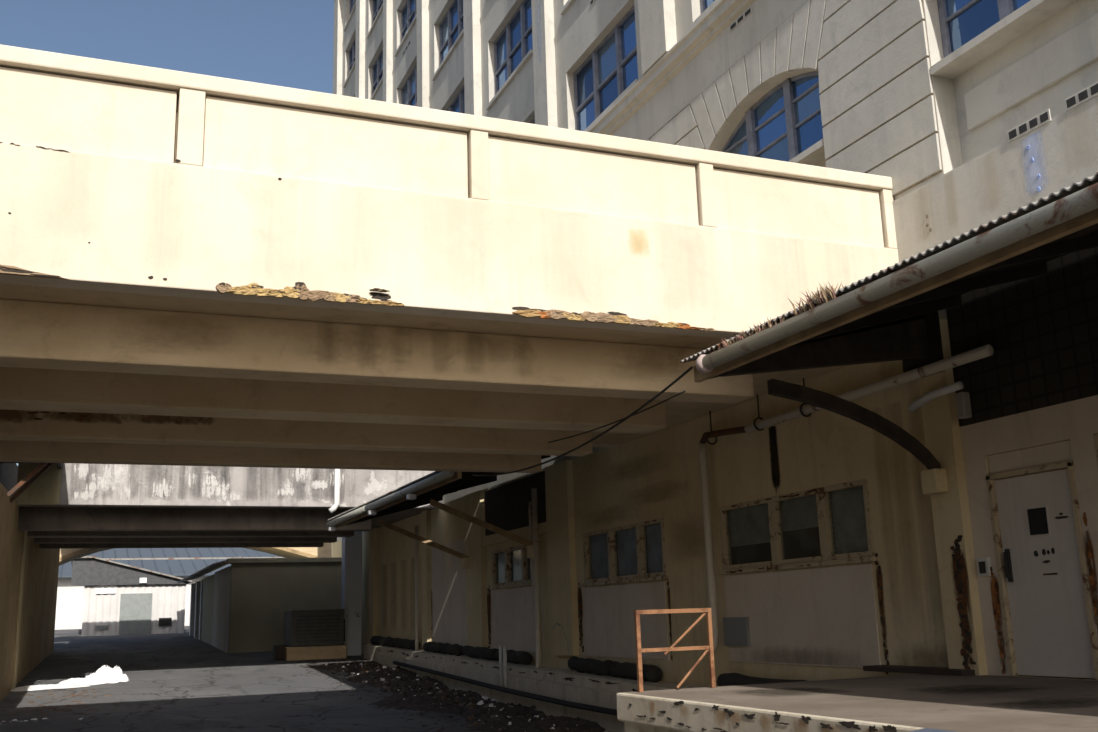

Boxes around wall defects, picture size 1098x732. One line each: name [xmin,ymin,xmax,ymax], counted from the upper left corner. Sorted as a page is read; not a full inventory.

crack [0,142,69,152]
peeling [0,265,70,280]
spalling [215,282,404,307]
spalling [512,307,716,331]
rust [1083,512,1098,628]
rust [874,553,889,675]
rust [990,567,1006,674]
spalling [629,689,756,732]
spalling [801,716,897,732]